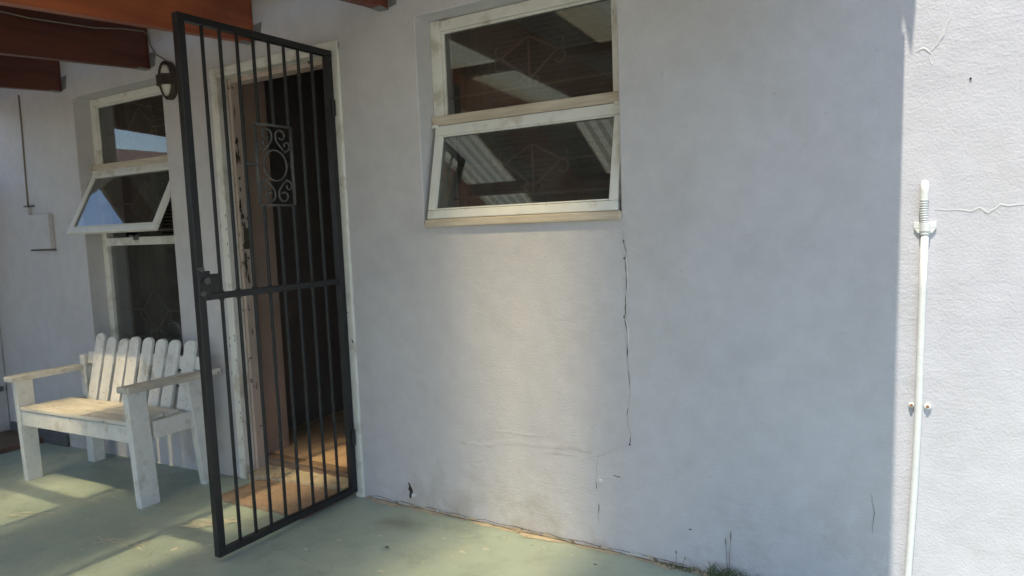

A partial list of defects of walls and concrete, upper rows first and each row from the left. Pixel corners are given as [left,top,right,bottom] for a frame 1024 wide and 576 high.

crack [936,203,1024,214]
crack [583,231,631,523]
peeling [365,483,717,576]